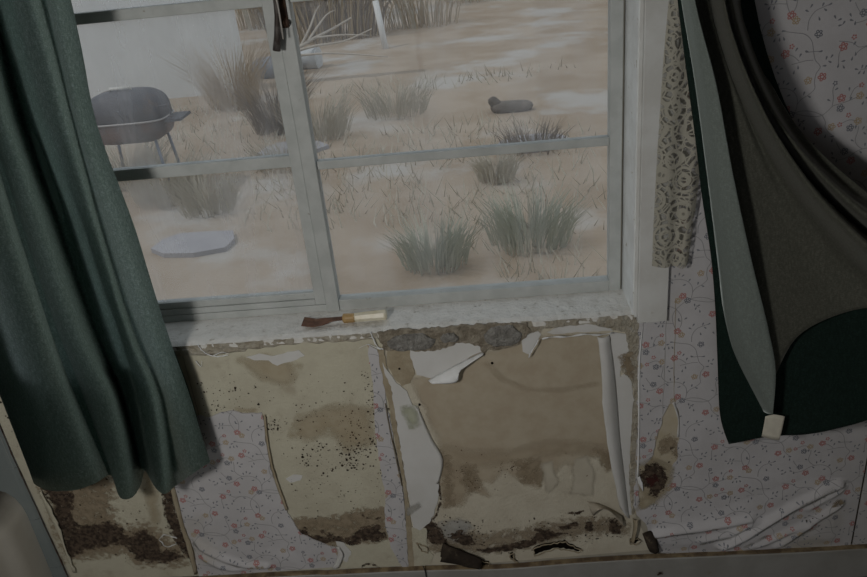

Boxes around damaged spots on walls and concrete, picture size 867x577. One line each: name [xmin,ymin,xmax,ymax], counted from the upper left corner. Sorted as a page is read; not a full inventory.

peeling [0,397,199,577]
water stain [32,471,196,570]
water stain [197,353,390,546]
peeling [174,315,680,572]
water stain [410,333,632,556]
water stain [634,434,679,511]